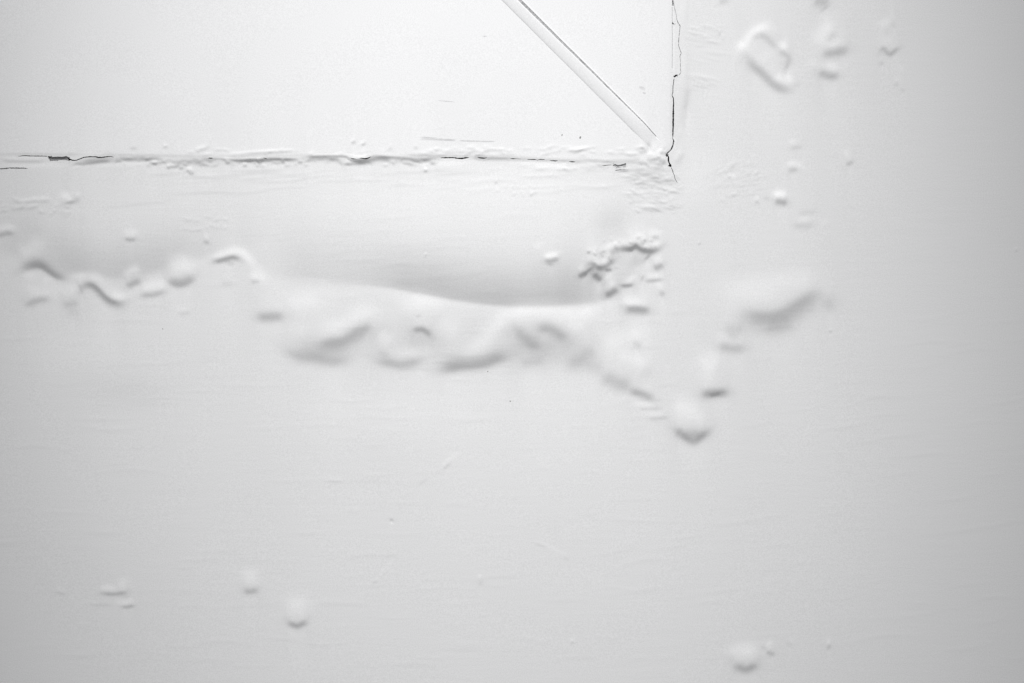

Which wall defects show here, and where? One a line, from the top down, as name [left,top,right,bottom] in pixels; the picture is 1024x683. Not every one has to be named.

crack [664,74,681,187]
crack [0,153,117,172]
crack [347,154,374,162]
crack [438,155,628,173]